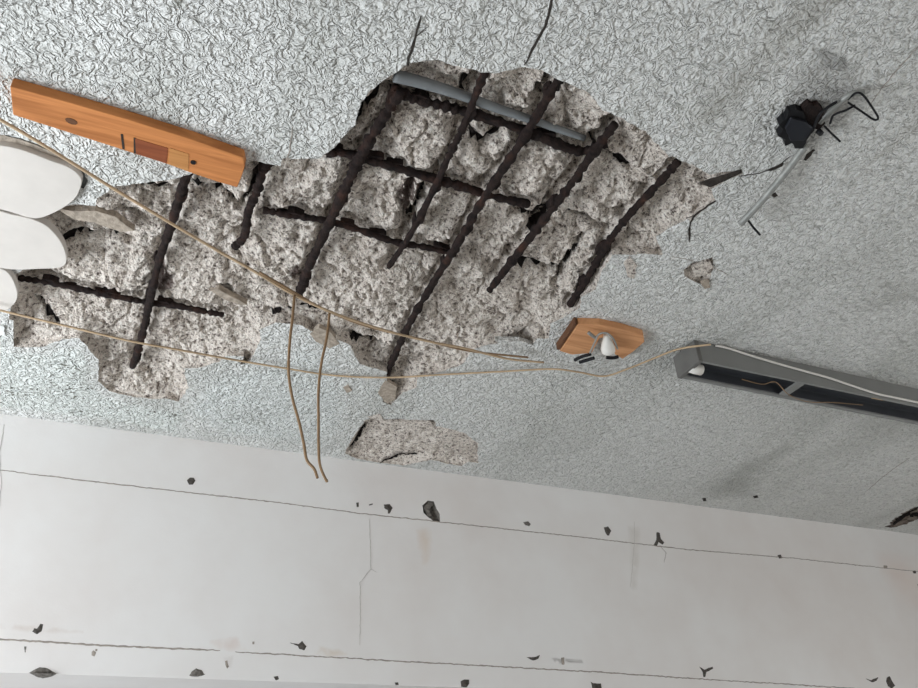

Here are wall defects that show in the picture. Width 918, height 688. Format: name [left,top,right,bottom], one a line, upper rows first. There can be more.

crack [406,16,427,66]
crack [524,0,553,65]
spalling [0,60,743,466]
crack [0,427,918,688]